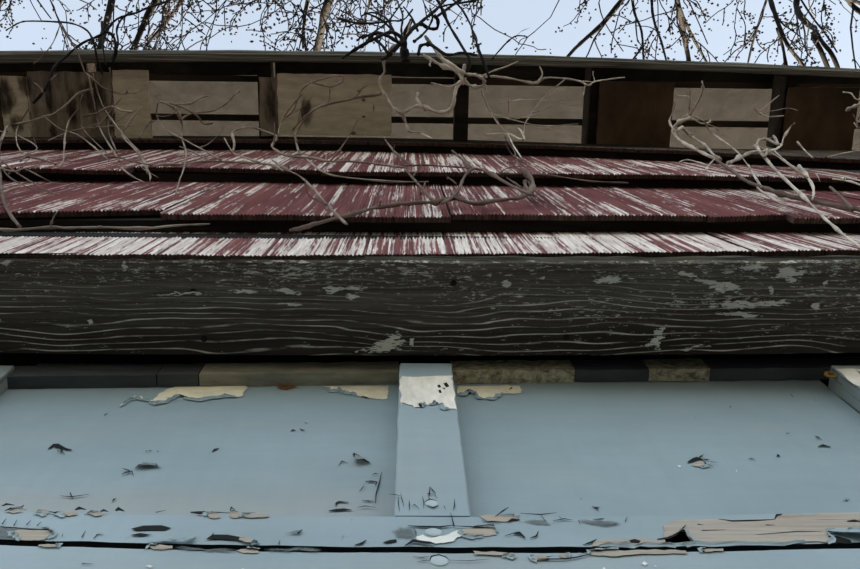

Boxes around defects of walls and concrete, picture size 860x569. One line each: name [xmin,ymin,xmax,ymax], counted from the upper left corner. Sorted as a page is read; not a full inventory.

peeling [741,264,806,283]
peeling [274,287,302,306]
peeling [708,282,790,318]
peeling [836,368,860,387]
peeling [120,386,248,407]
peeling [326,376,523,410]
peeling [190,507,269,519]
peeling [0,503,124,548]
peeling [383,507,627,546]
peeling [528,513,860,567]
peeling [474,551,517,560]